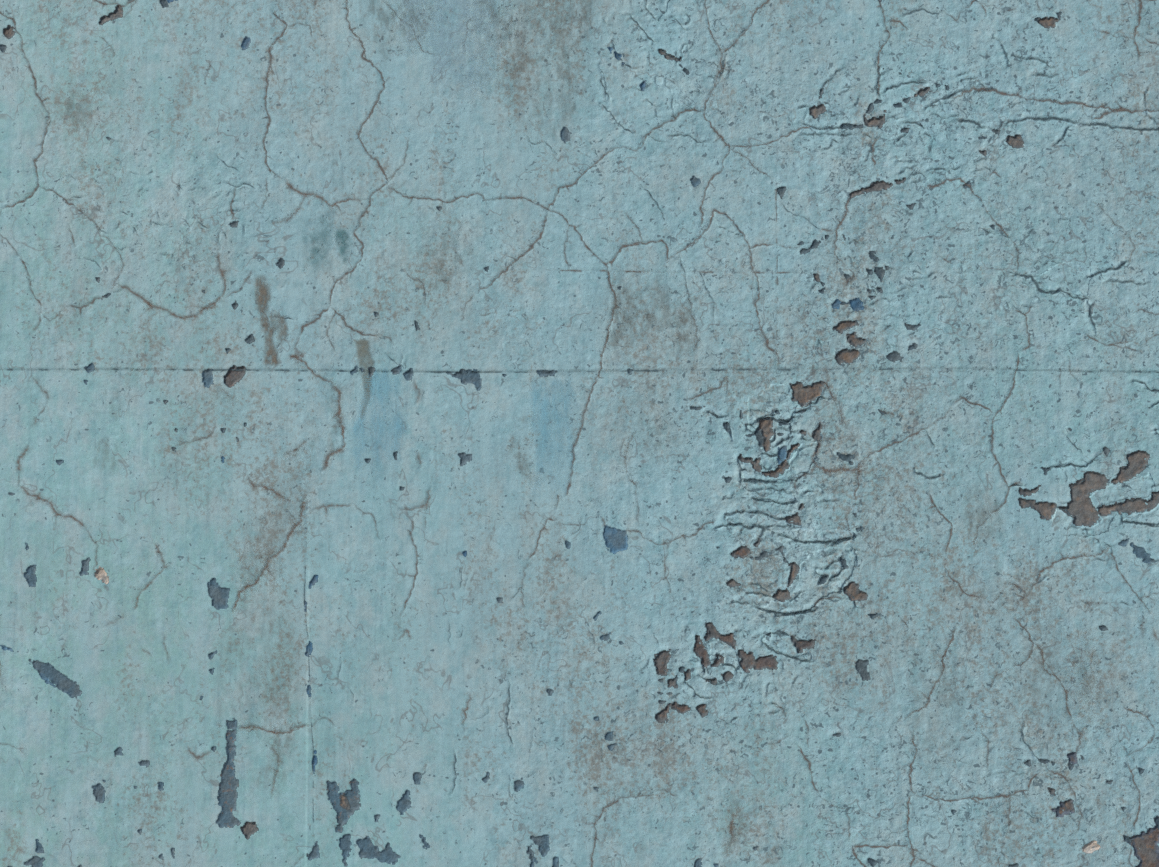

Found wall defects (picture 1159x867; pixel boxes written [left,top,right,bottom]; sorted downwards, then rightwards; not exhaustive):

crack [0,0,1159,597]
flaking render [831,251,889,364]
flaking render [738,410,822,478]
crack [602,161,1157,806]
flaking render [1018,450,1159,527]
crack [234,481,343,694]
crack [403,497,430,635]
flaking render [653,622,778,723]
peeling [211,719,258,839]
peeling [326,778,400,866]
crack [849,630,1093,867]
crack [1128,709,1157,866]